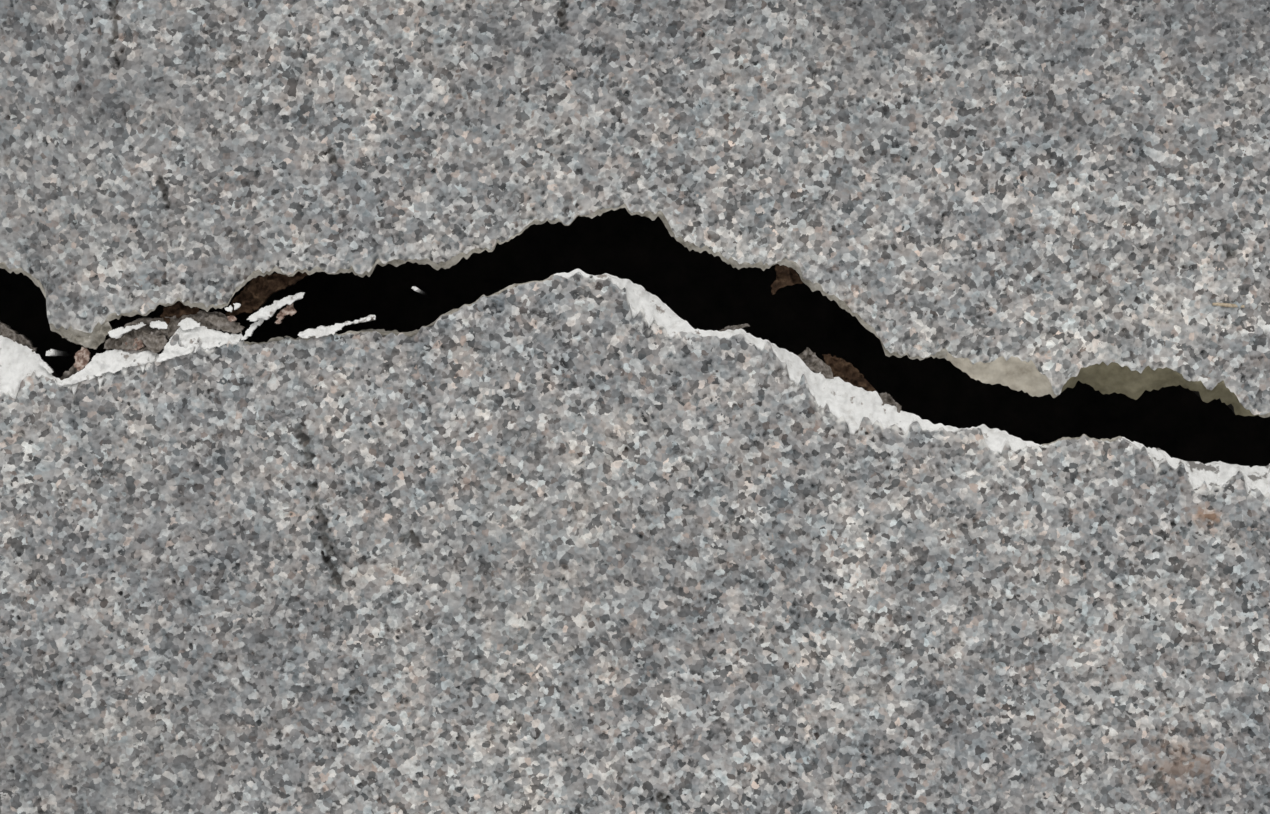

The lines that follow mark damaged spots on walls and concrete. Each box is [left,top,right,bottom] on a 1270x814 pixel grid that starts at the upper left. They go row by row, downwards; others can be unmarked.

crack [0,204,1270,467]